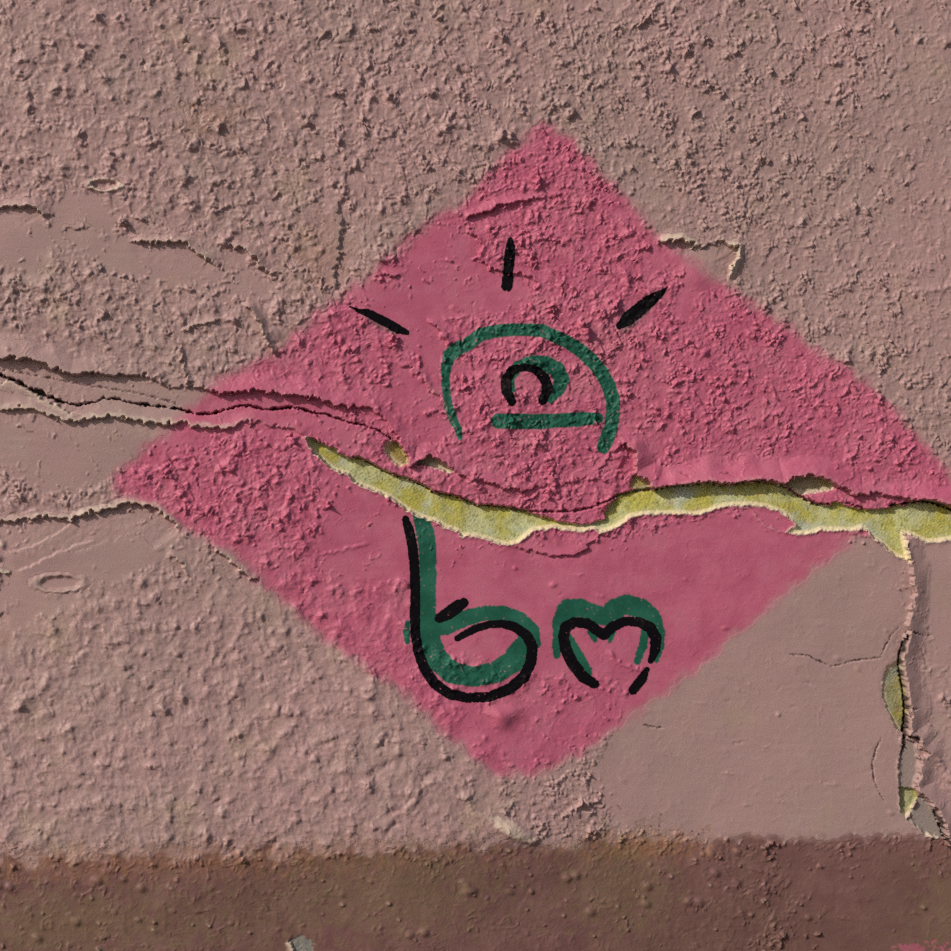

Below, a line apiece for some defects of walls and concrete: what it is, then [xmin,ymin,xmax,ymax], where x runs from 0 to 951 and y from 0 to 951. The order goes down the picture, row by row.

peeling [0,197,51,219]
peeling [60,220,92,233]
peeling [130,233,283,277]
peeling [657,232,745,281]
crack [0,338,951,848]